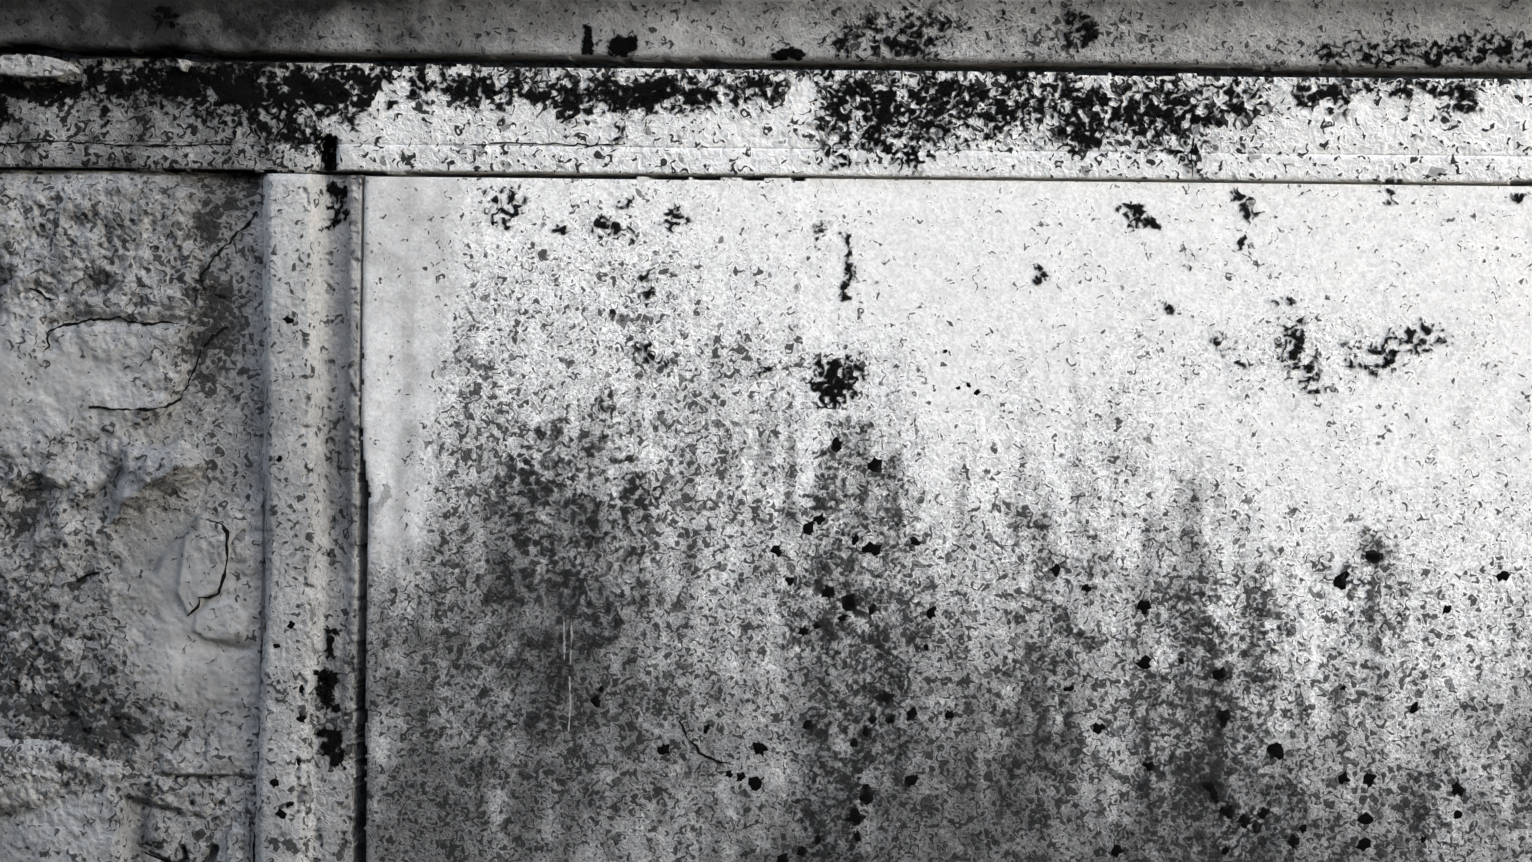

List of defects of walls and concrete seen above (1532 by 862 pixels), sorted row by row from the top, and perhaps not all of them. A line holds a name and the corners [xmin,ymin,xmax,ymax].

water stain [0,57,1484,231]
water stain [469,385,664,795]
water stain [777,421,936,862]
water stain [993,524,1103,834]
water stain [1126,546,1311,862]
water stain [1338,526,1419,709]
water stain [1400,730,1467,862]